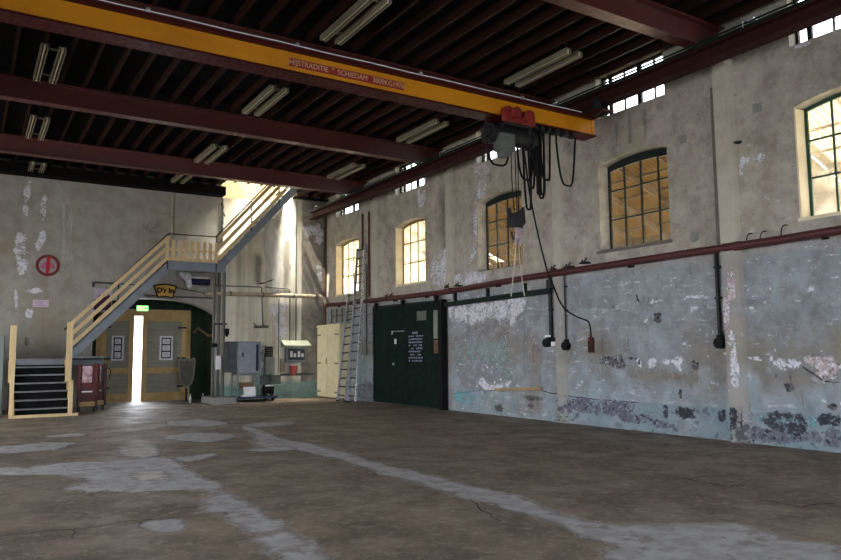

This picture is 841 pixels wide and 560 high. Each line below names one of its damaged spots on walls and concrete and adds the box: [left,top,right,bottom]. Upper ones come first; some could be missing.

peeling [22,181,32,217]
peeling [13,231,47,275]
peeling [448,297,526,325]
peeling [723,271,740,389]
peeling [600,354,699,372]
peeling [748,355,841,384]